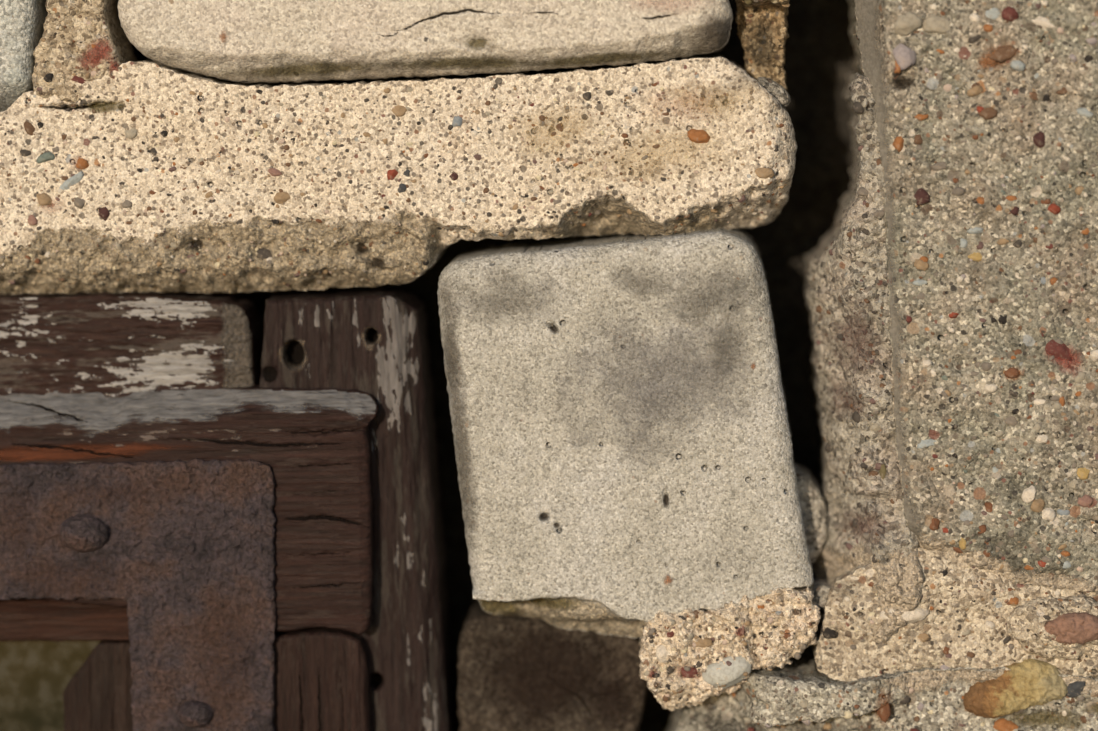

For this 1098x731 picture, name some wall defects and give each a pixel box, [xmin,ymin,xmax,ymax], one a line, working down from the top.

crack [381,9,501,37]
peeling [0,297,62,373]
peeling [97,297,217,329]
peeling [299,301,334,327]
peeling [352,299,360,347]
peeling [73,335,233,397]
peeling [375,296,419,433]
peeling [394,513,426,587]
peeling [407,618,432,666]
peeling [422,683,438,731]